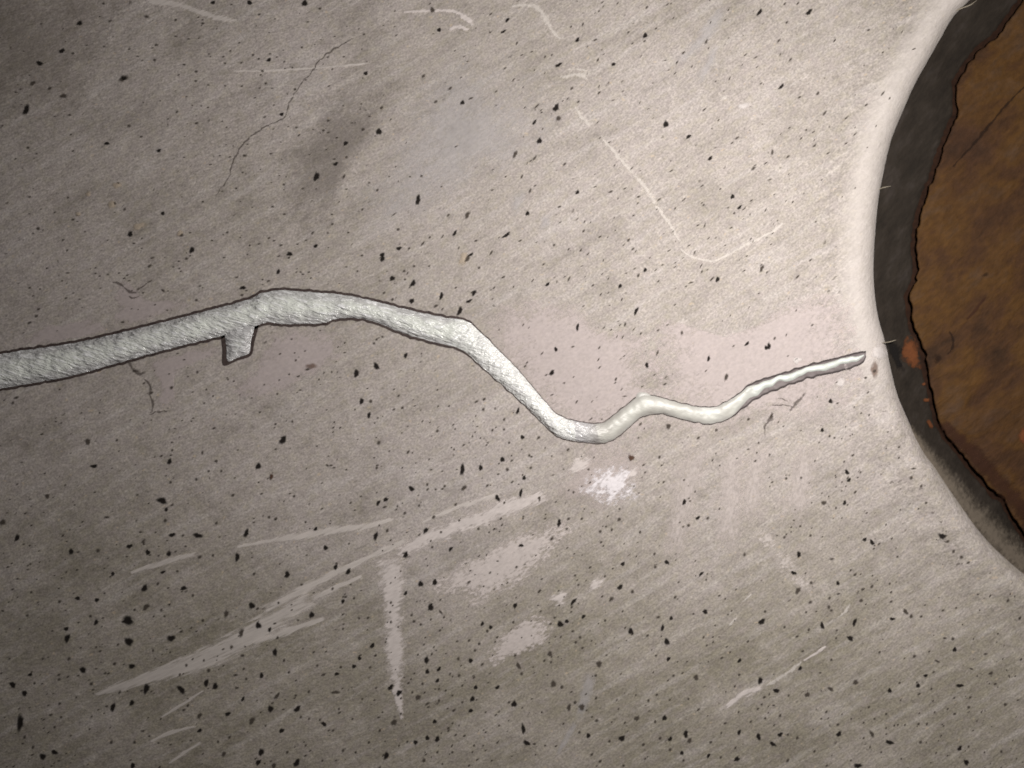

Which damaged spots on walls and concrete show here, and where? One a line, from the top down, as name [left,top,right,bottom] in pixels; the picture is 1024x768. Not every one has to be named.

crack [0,287,866,445]